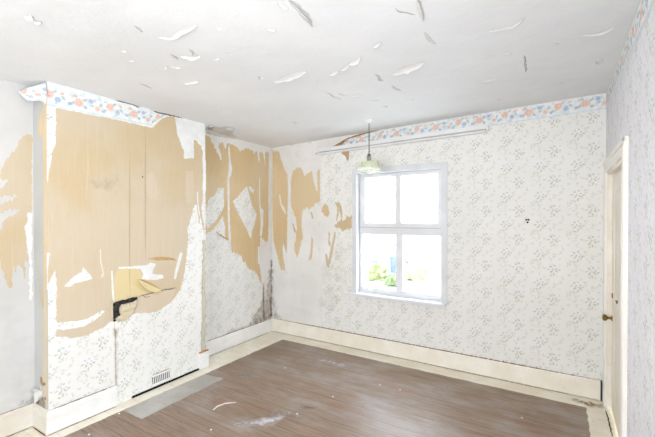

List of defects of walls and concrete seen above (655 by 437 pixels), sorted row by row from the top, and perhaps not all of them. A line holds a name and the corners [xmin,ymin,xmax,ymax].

peeling [278,0,313,27]
peeling [17,82,47,104]
flaking render [272,143,352,327]
peeling [111,262,163,322]